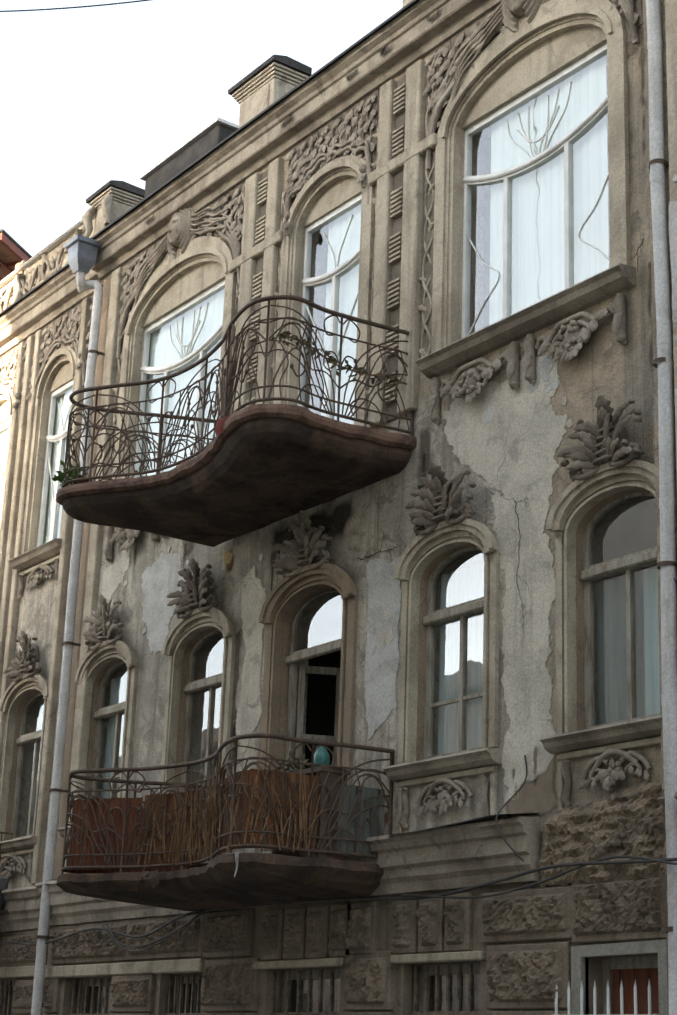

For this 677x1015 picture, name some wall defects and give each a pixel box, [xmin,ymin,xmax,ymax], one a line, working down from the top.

peeling [98,550,131,603]
peeling [141,545,190,654]
peeling [440,353,572,808]